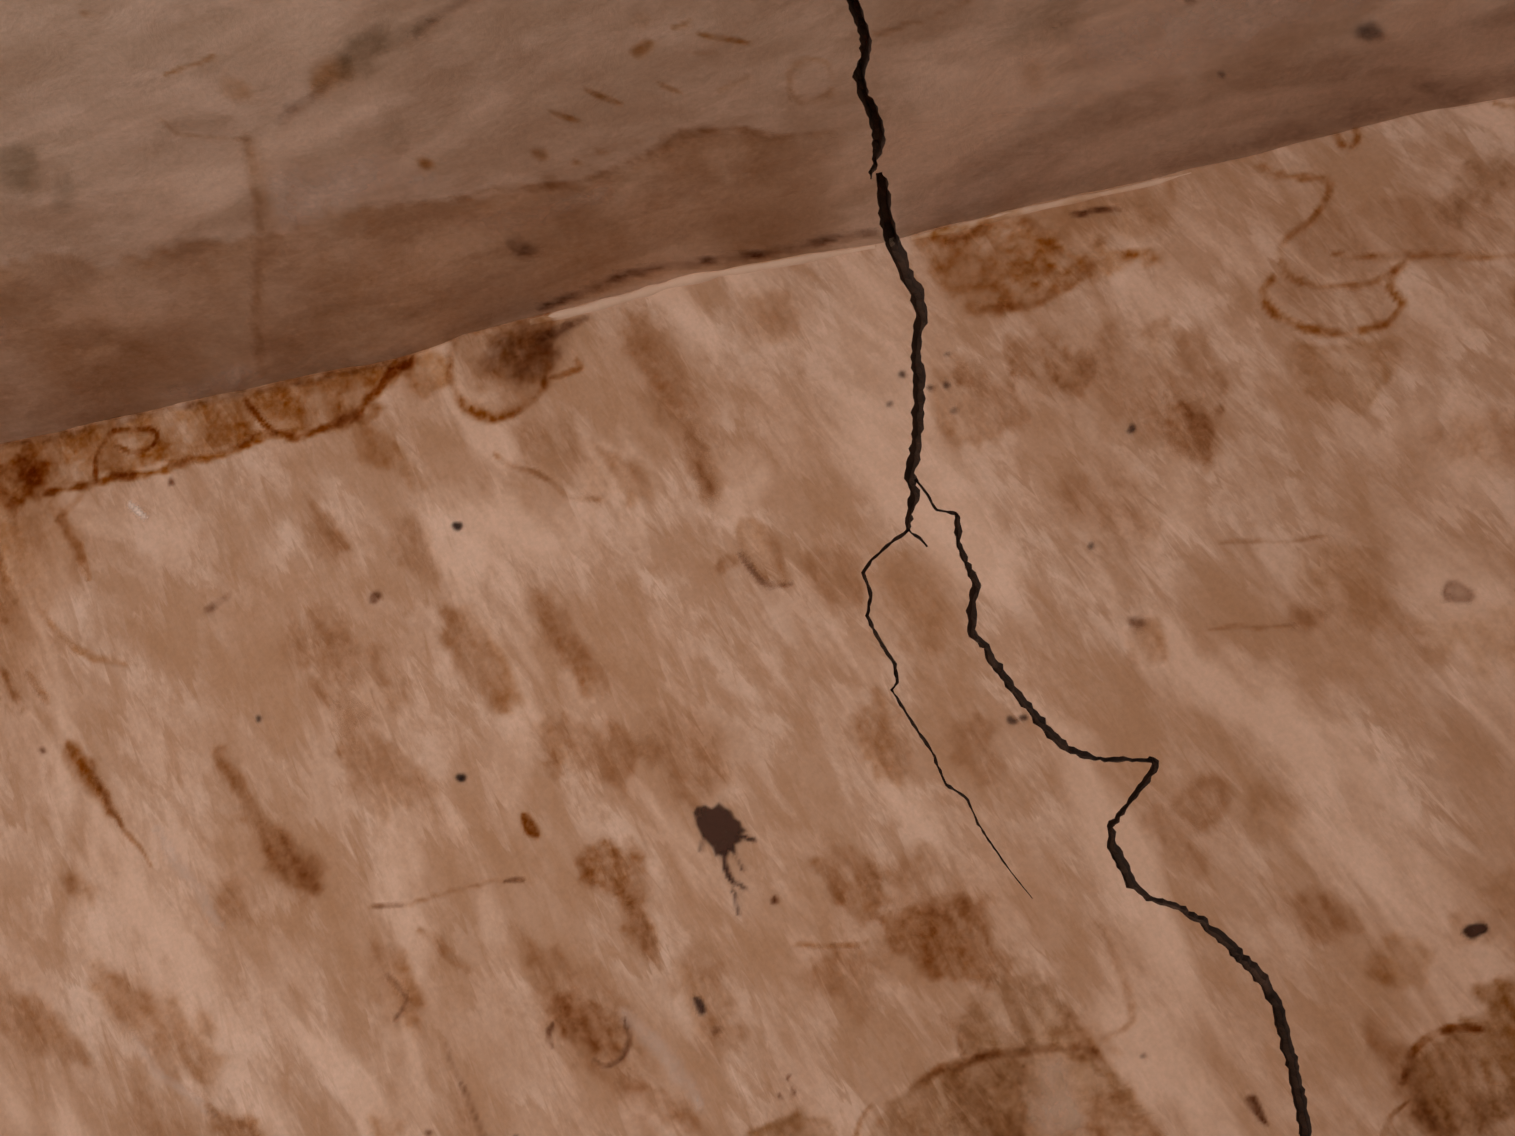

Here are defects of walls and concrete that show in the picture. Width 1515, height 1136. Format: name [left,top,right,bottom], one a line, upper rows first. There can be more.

crack [846,0,1312,1136]
leakage [694,804,754,914]
leakage [1442,983,1515,1083]